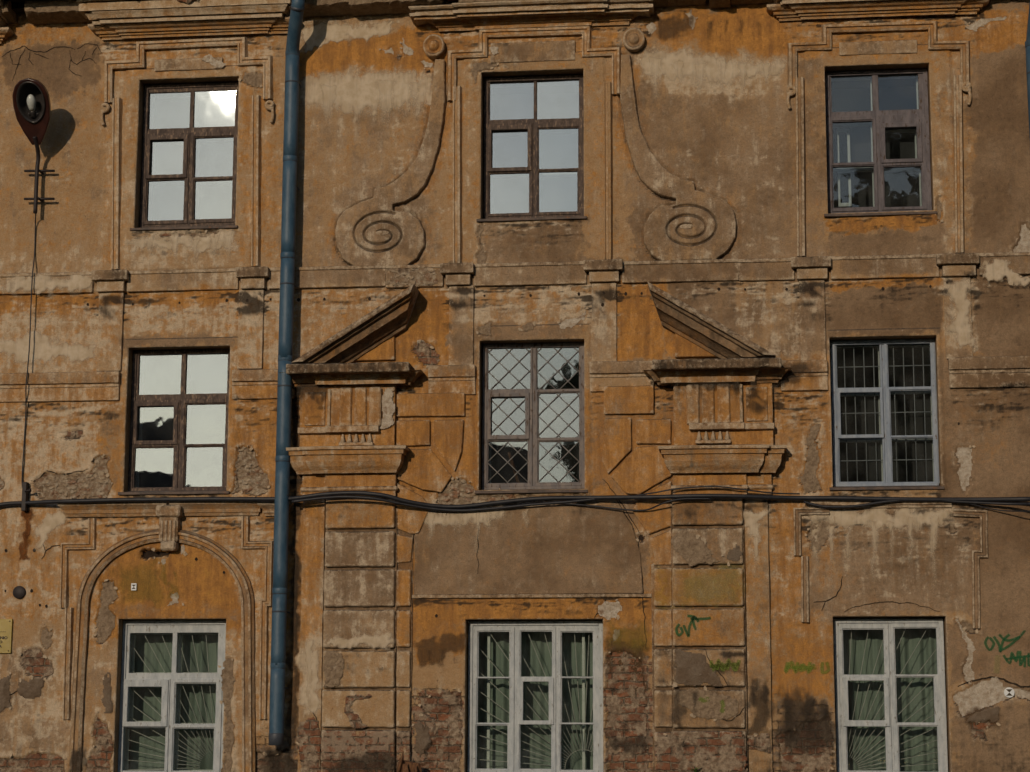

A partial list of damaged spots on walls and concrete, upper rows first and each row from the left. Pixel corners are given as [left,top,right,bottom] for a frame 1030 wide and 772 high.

crack [2,43,102,81]
flaking render [32,454,113,500]
flaking render [232,445,270,495]
flaking render [93,579,118,644]
crack [814,576,940,612]
flaking render [19,628,53,677]
leakage [416,633,465,666]
flaking render [598,599,835,772]
flaking render [953,616,1030,740]
leakage [747,680,833,751]
flaking render [0,753,66,772]